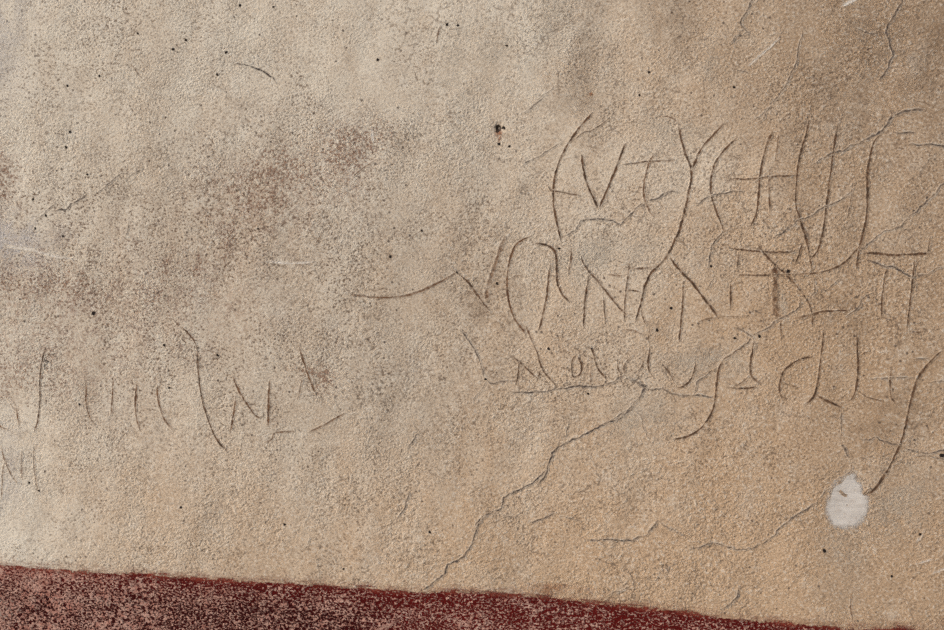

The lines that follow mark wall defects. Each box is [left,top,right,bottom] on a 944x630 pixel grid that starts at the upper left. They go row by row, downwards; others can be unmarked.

crack [728,0,755,45]
crack [854,0,905,81]
crack [755,28,805,124]
crack [522,141,563,166]
crack [810,107,944,168]
crack [564,189,744,238]
crack [707,227,731,290]
crack [773,187,856,239]
crack [860,182,944,279]
crack [422,276,944,591]
crack [720,586,741,612]